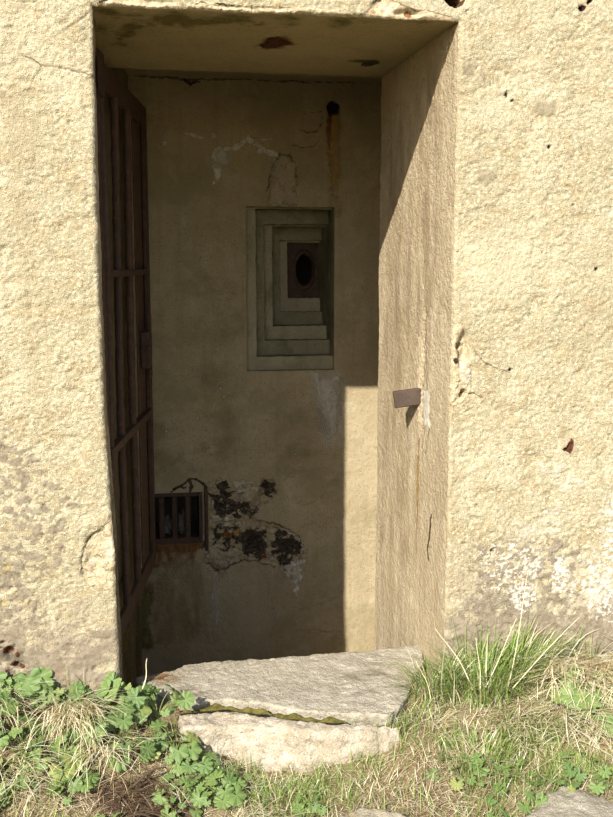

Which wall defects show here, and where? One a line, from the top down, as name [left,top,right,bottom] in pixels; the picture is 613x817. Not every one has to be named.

corrosion [259,37,293,50]
spalling [204,478,308,597]
damp [445,524,613,663]
spalling [0,640,25,674]